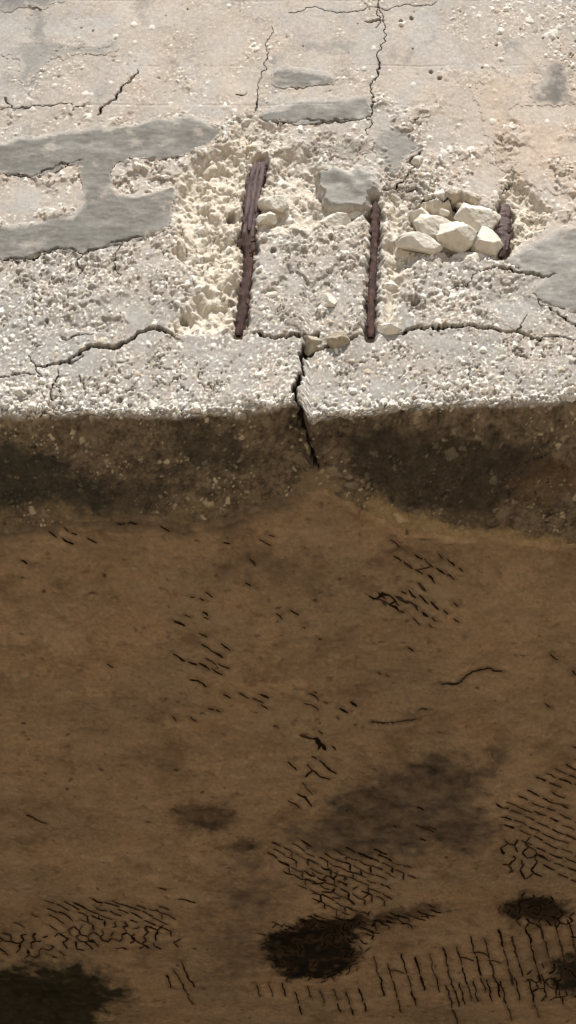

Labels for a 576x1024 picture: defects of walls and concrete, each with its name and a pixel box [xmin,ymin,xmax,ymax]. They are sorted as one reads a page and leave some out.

crack [235,0,436,144]
crack [0,326,167,401]
rust [234,161,267,337]
crack [258,332,326,467]
spalling [166,119,482,340]
rust [364,201,381,339]
crack [399,266,576,342]
spalling [438,172,555,261]
rust [495,204,513,260]
water stain [163,730,522,1008]
water stain [496,890,576,931]
water stain [0,947,144,1024]